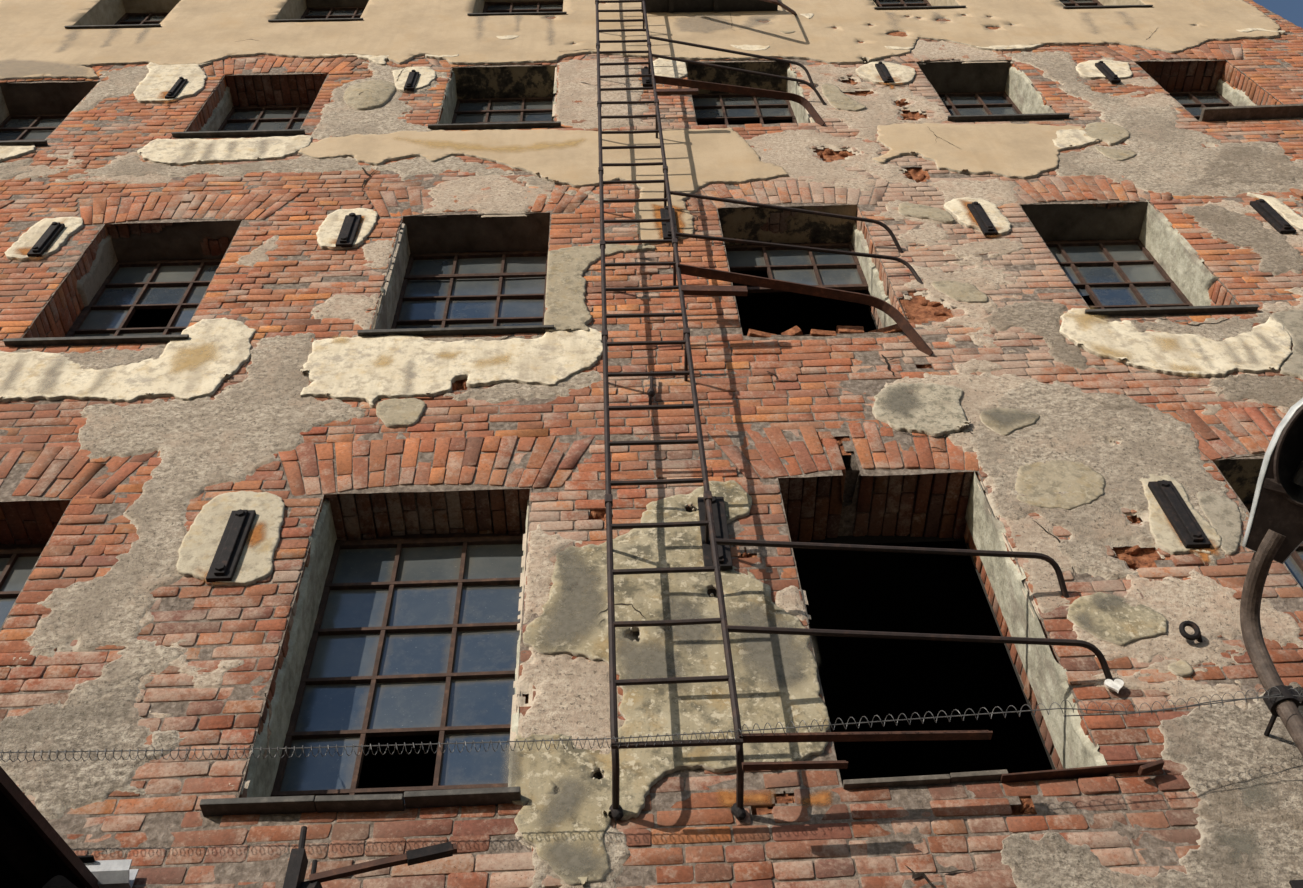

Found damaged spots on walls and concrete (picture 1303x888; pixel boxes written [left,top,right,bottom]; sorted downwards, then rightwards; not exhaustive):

flaking render [311,223,405,330]
flaking render [874,200,1303,415]
flaking render [0,244,603,820]
flaking render [510,480,830,888]
spalling [817,432,860,506]
flaking render [872,357,1303,888]
crack [905,865,978,888]